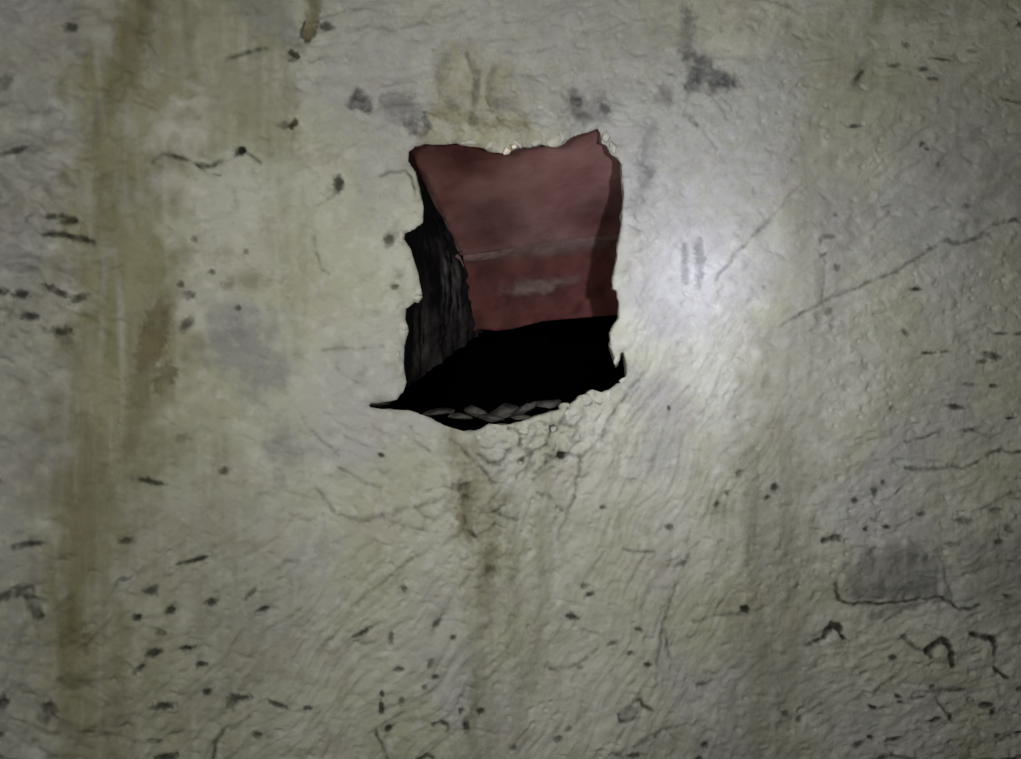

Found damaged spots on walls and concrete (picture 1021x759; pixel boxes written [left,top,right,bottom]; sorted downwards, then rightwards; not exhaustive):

peeling [453,129,566,155]
peeling [602,130,616,154]
spalling [371,151,627,448]